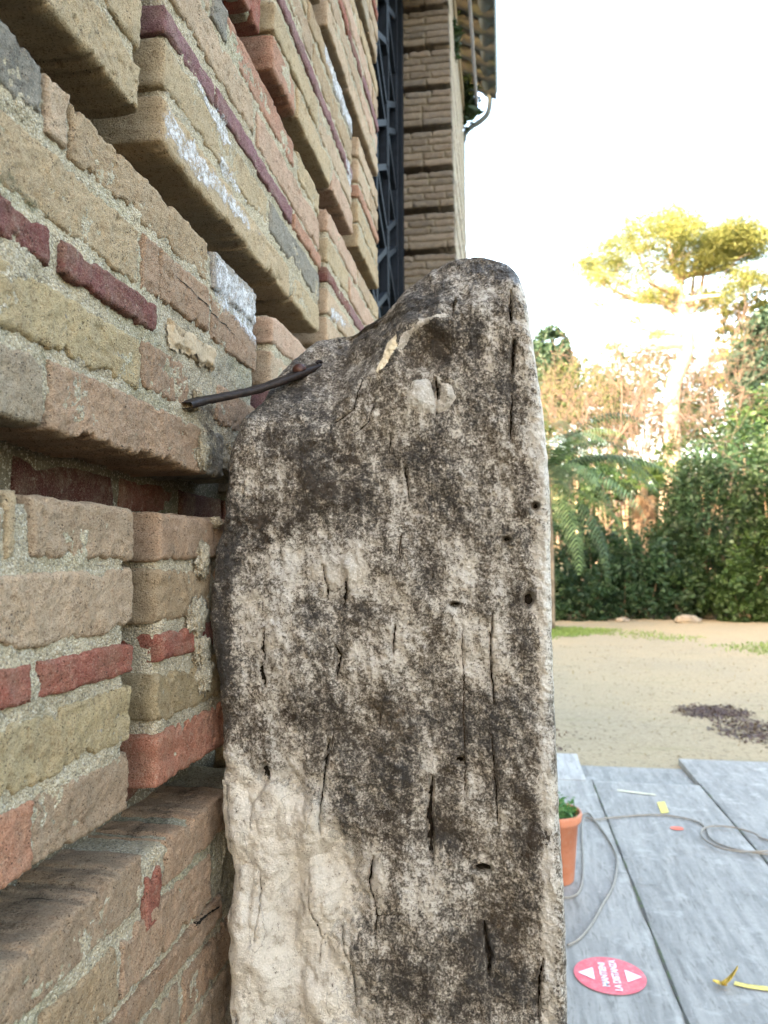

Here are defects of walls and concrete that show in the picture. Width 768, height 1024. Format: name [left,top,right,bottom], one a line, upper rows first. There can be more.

peeling [376,334,398,373]
crack [507,293,515,374]
crack [507,401,515,439]
crack [426,776,434,854]
crack [483,920,491,969]